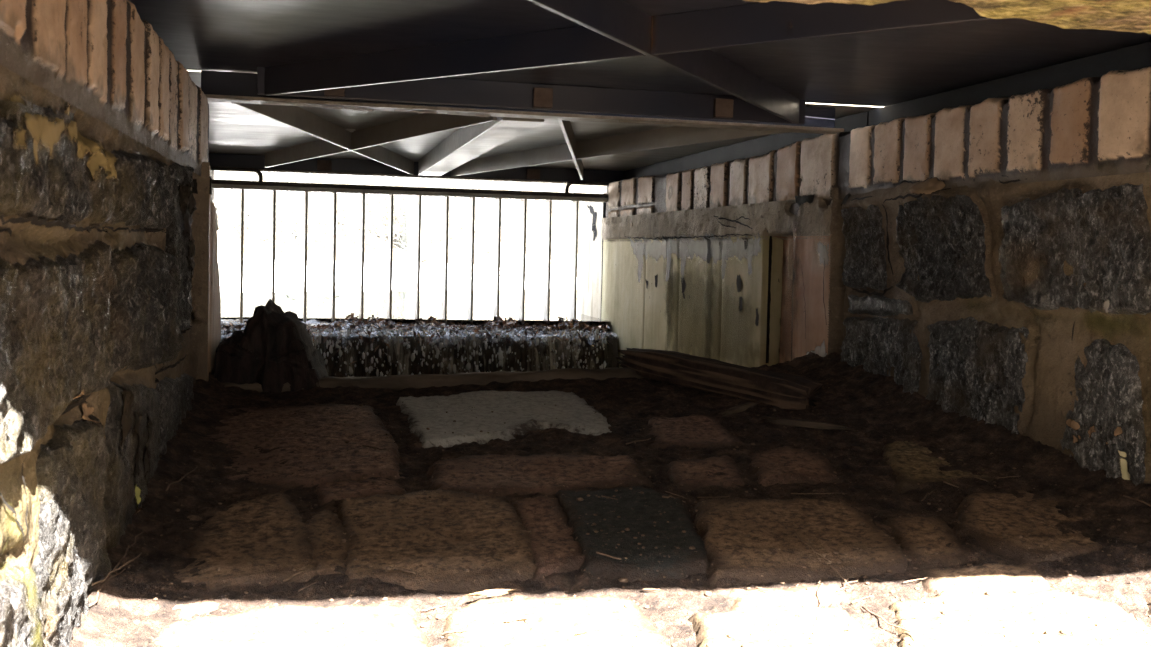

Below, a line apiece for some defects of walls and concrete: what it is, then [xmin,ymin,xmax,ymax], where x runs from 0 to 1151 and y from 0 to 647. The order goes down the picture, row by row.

peeling [10,93,117,179]
leakage [704,237,723,264]